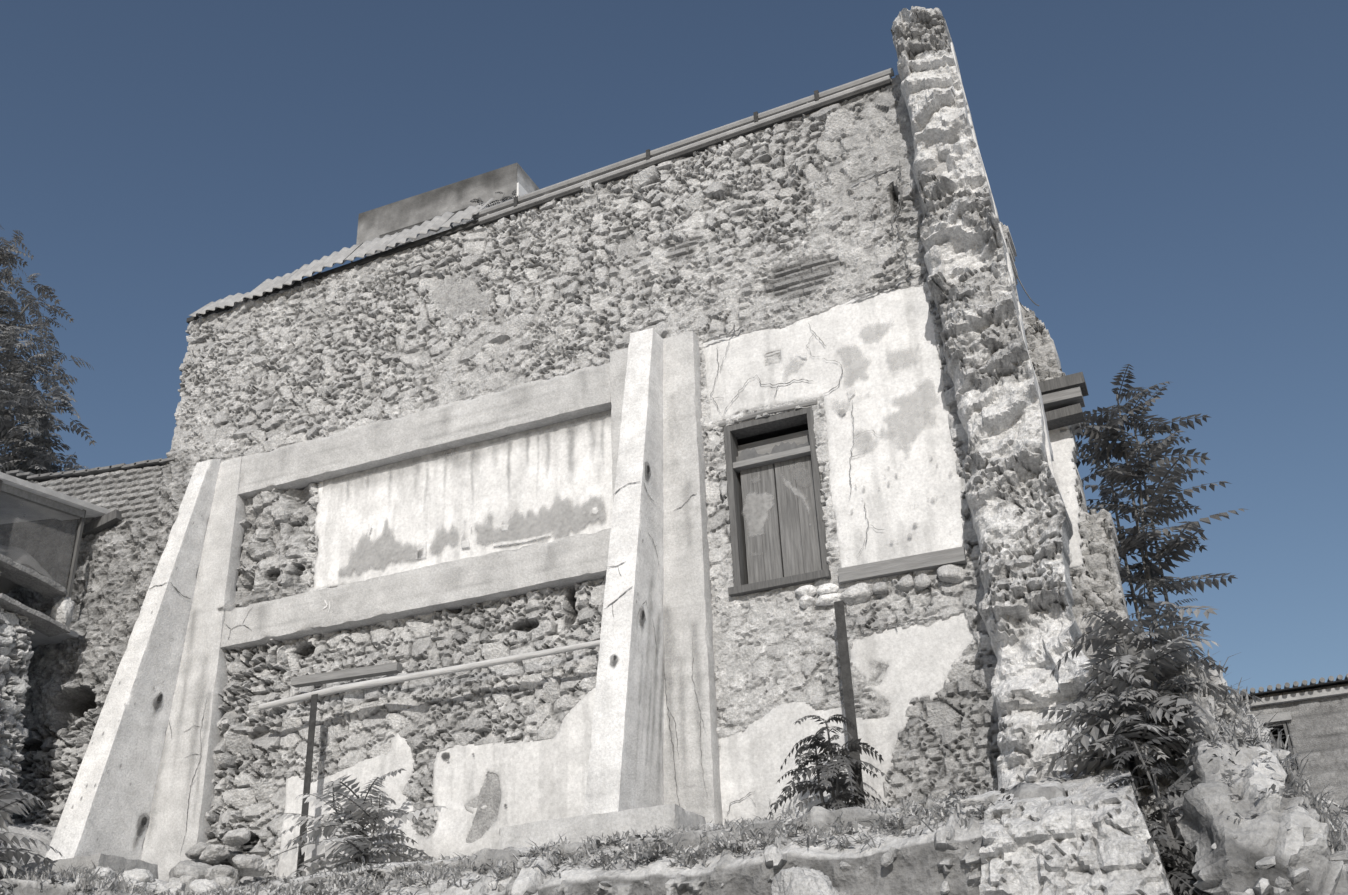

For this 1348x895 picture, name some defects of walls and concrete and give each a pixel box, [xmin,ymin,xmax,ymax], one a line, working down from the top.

crack [702,323,884,554]
spalling [464,772,507,843]